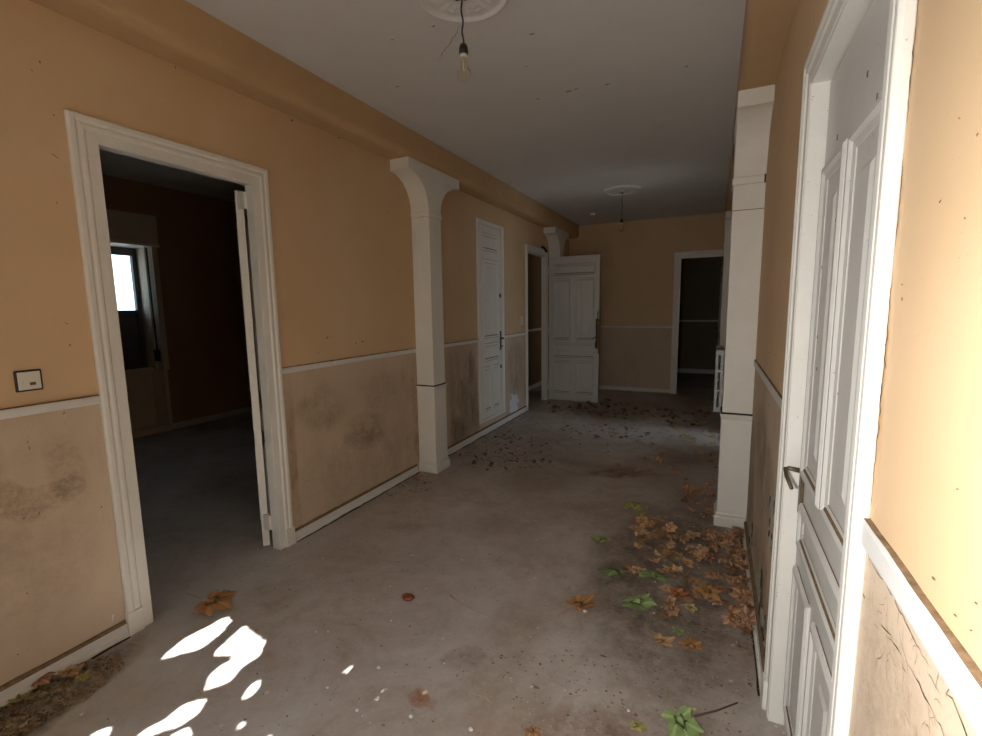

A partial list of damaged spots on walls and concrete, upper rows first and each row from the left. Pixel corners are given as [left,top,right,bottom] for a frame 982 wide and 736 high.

crack [863,562,967,736]